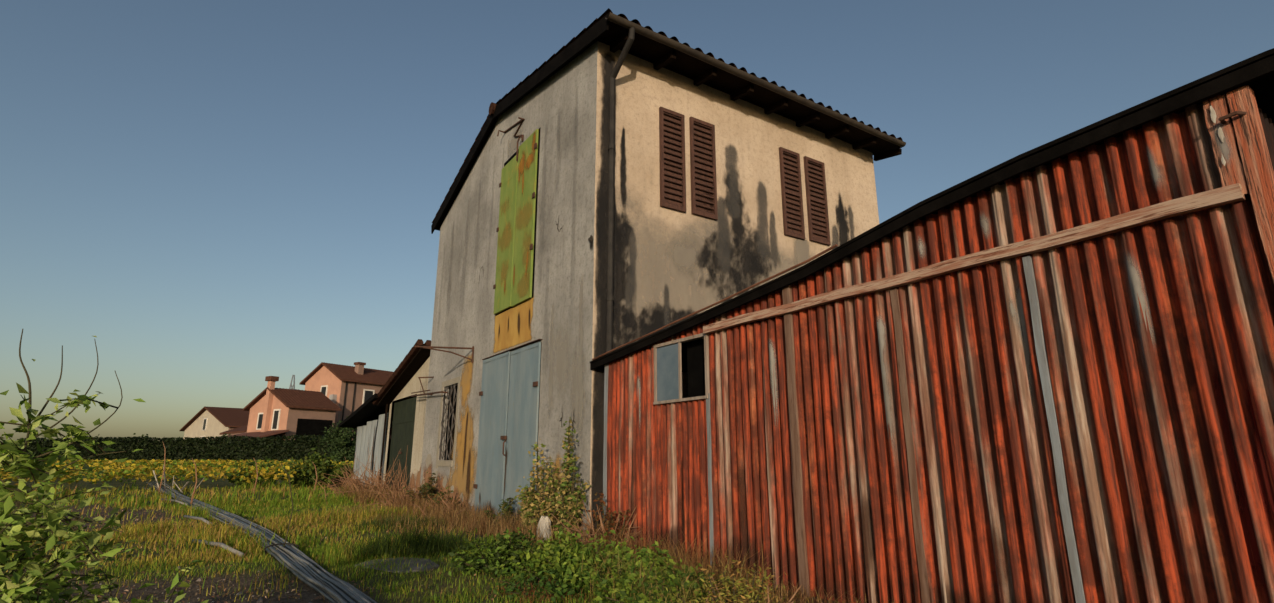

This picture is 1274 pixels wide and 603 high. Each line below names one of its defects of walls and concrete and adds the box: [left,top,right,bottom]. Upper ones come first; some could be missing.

damp [832,195,854,249]
damp [549,53,810,538]
corrosion [619,454,791,587]
corrosion [821,502,972,603]
corrosion [1130,526,1146,603]
corrosion [1213,371,1274,586]